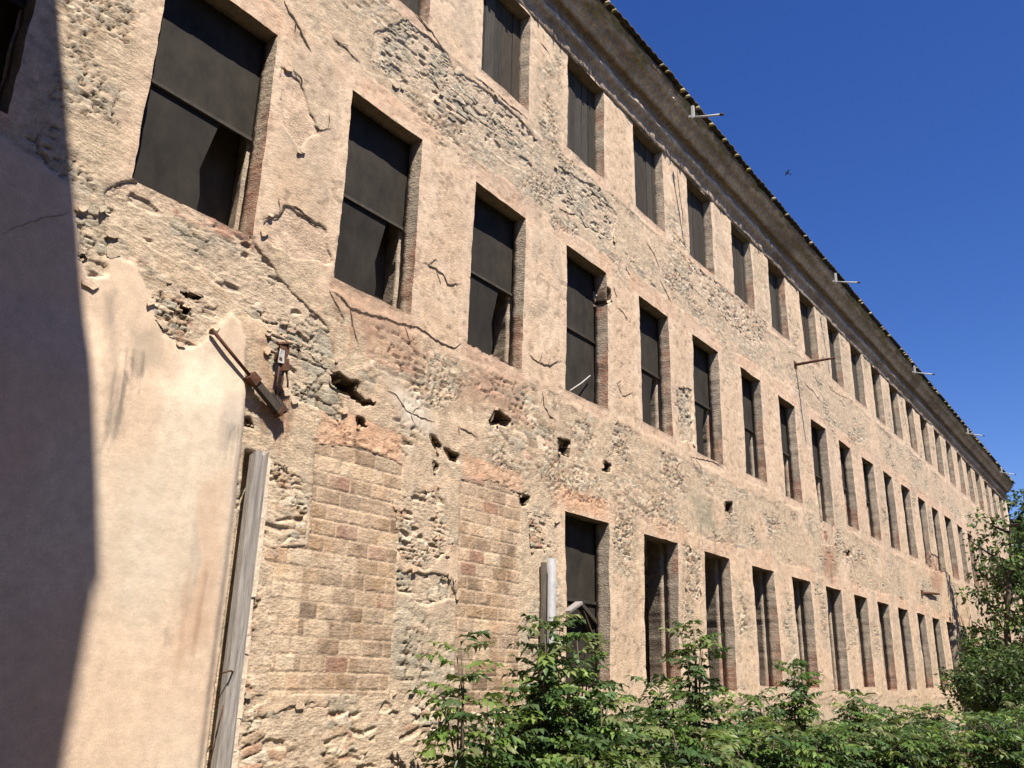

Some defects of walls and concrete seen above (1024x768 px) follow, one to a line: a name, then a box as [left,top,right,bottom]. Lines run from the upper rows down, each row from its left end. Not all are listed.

spalling [371,16,538,175]
crack [264,202,327,228]
spalling [555,164,617,243]
crack [424,258,462,286]
spalling [74,182,348,424]
crack [330,291,461,349]
crack [388,390,478,437]